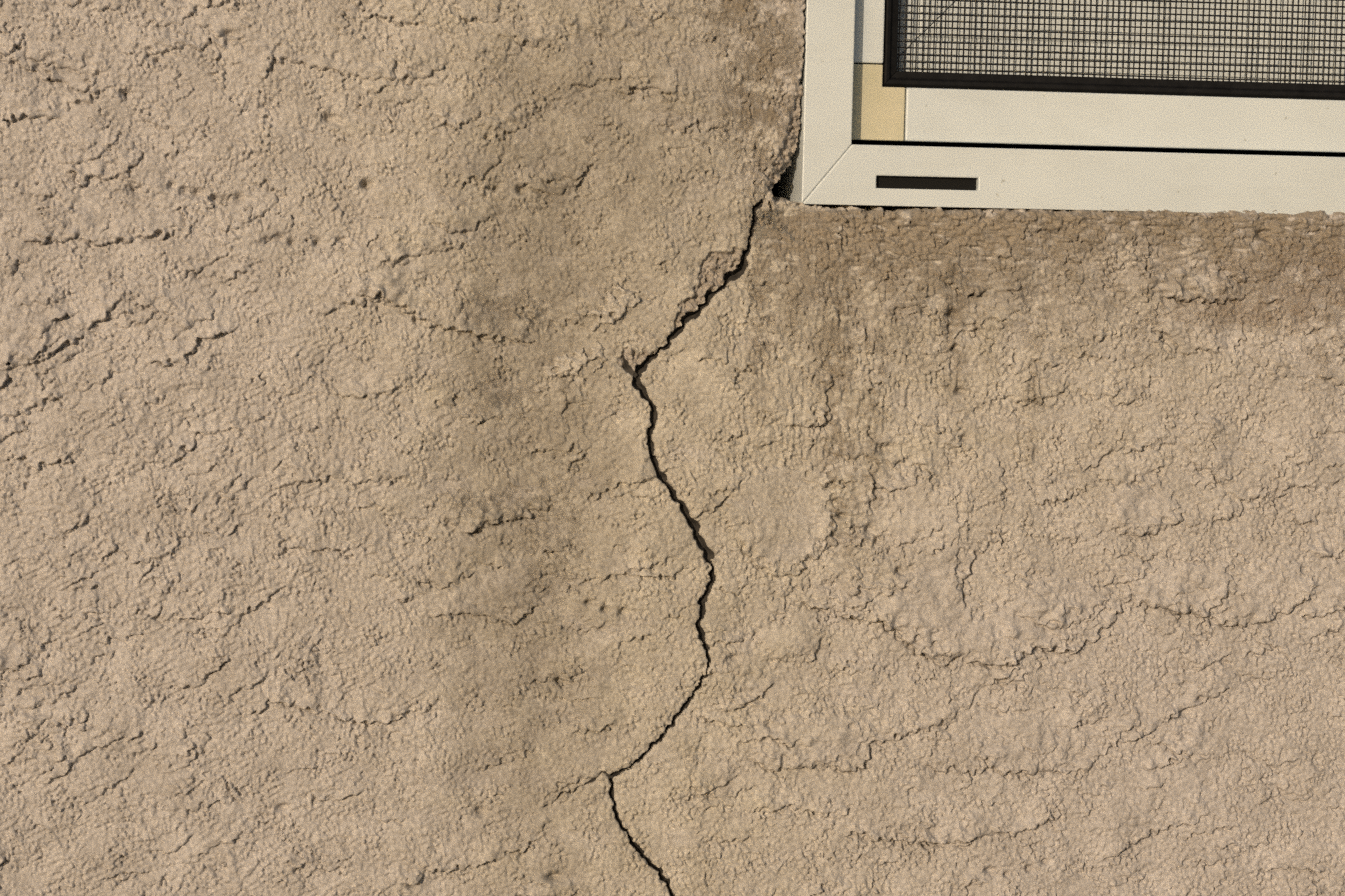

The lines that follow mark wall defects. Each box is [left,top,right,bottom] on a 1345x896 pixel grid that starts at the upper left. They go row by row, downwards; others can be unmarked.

crack [544,200,763,896]